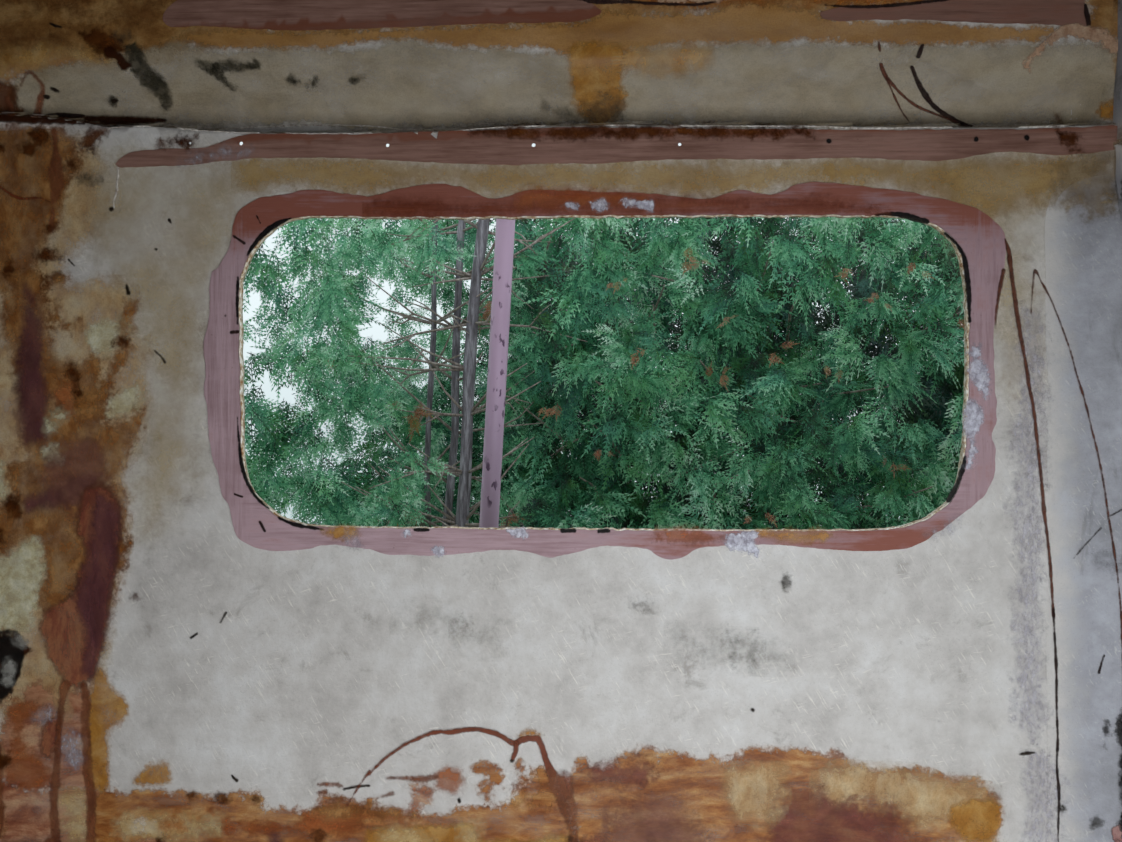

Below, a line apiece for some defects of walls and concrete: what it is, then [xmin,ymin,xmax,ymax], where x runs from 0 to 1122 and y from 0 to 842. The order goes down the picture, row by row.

corrosion [0,81,24,116]
corrosion [23,71,59,118]
leakage [0,0,1118,131]
crack [878,42,973,127]
leakage [20,140,191,547]
leakage [0,281,128,791]
corrosion [0,122,1002,842]
crack [995,238,1122,842]
spalling [0,630,30,702]